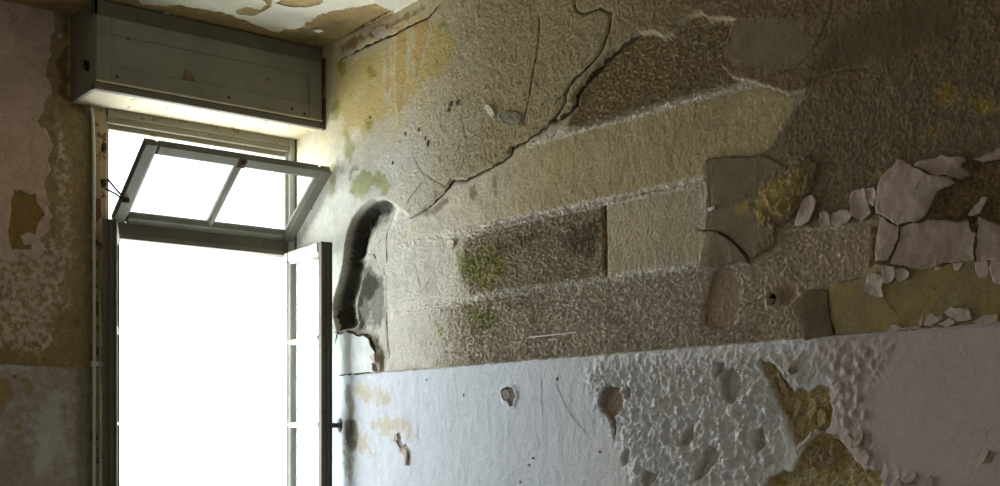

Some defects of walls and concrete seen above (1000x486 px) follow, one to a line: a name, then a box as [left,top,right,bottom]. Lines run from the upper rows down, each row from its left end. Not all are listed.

peeling [138,0,418,33]
peeling [0,0,78,356]
crack [386,3,642,257]
flaking render [334,11,1000,381]
peeling [500,387,516,407]
spalling [599,386,631,440]
flaking render [762,359,884,486]